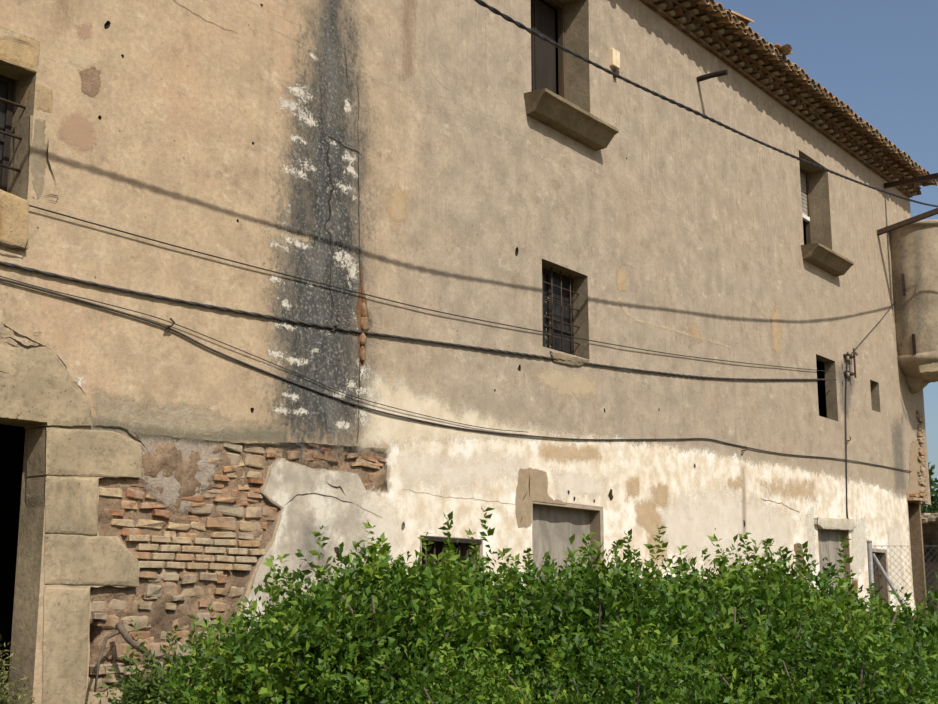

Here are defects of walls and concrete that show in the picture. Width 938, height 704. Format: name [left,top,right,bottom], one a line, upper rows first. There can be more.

water stain [217,0,388,452]
crack [320,45,361,324]
crack [356,210,364,301]
rust [357,266,369,367]
water stain [92,421,133,432]
crack [355,371,363,434]
crack [269,483,384,519]
peeling [88,410,929,693]